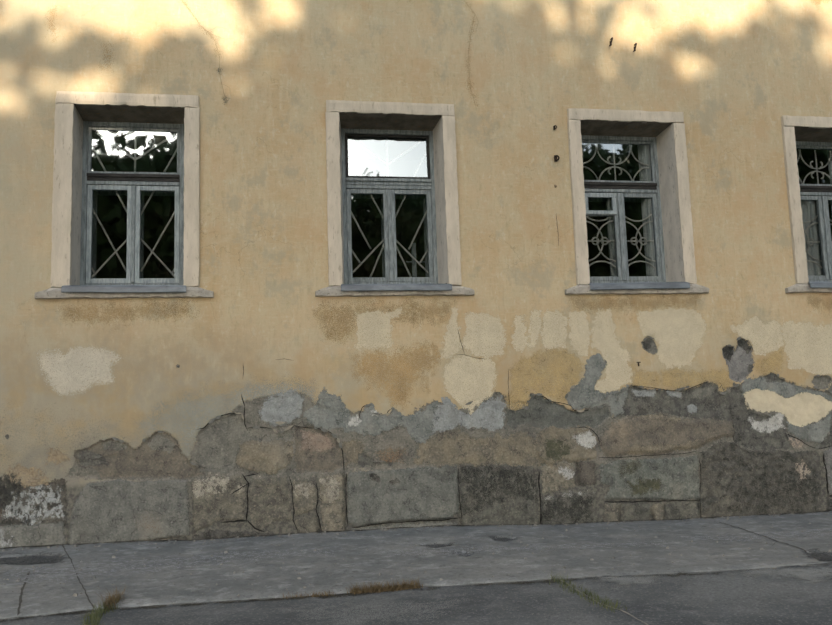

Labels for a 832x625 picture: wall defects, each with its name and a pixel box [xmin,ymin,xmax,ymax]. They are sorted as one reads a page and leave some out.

crack [178,0,233,104]
damp [0,376,317,515]
spalling [0,336,832,526]